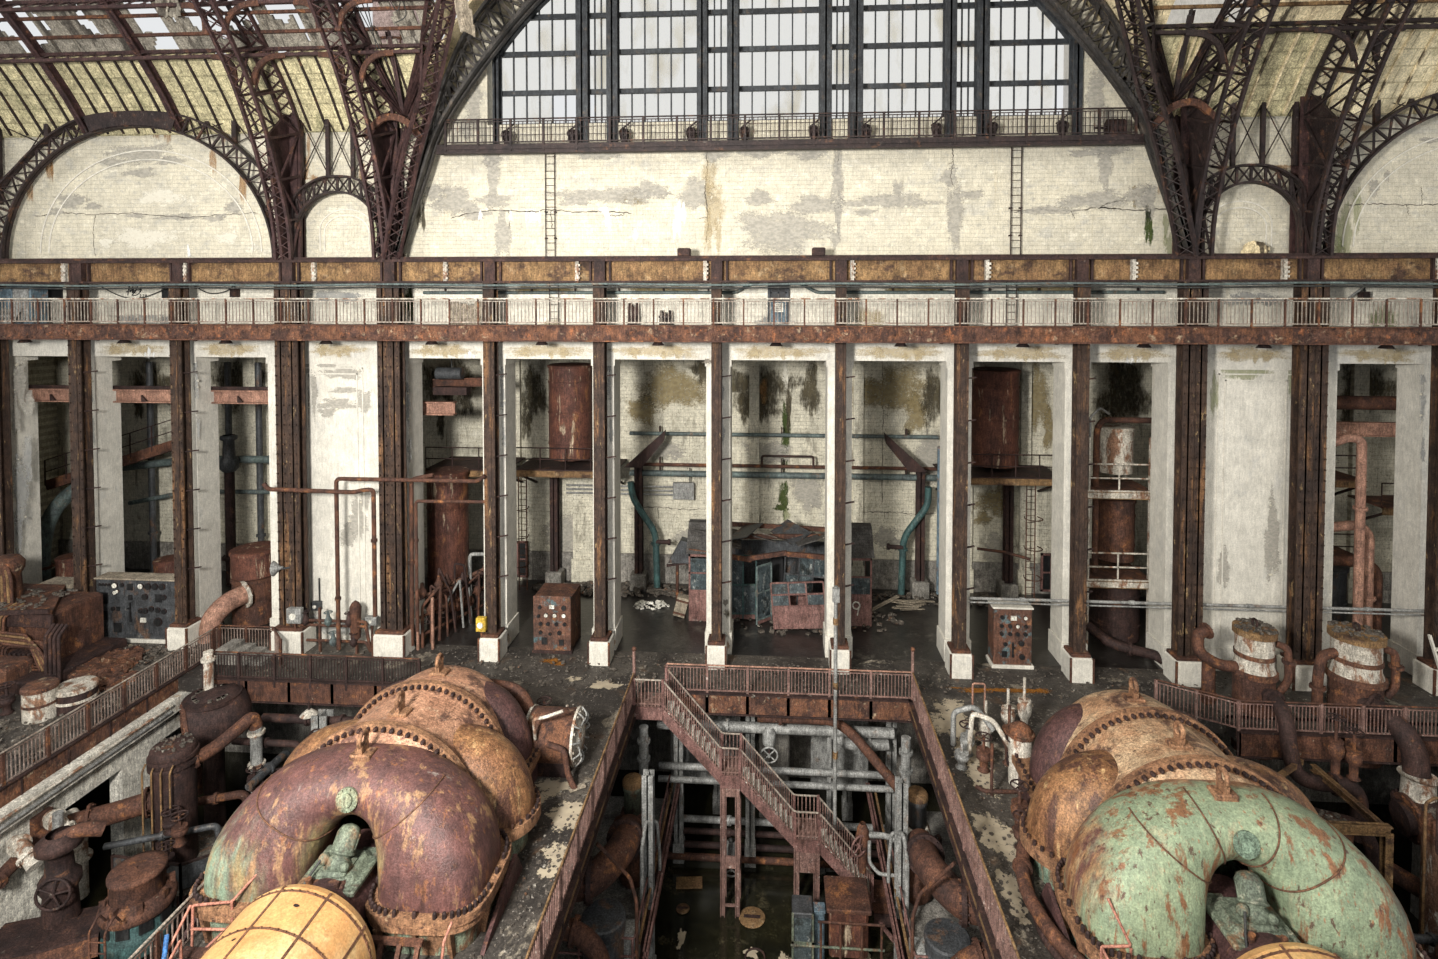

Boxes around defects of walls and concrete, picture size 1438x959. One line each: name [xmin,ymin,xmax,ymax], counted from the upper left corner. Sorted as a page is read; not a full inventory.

peeling [548,176,718,209]
peeling [695,137,985,255]
leakage [515,344,584,437]
leakage [732,346,820,424]